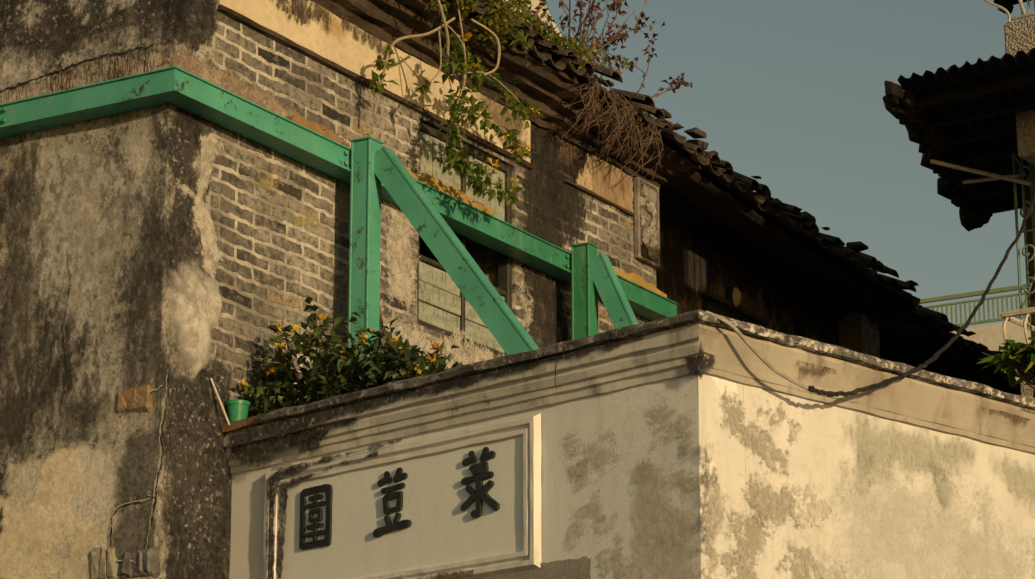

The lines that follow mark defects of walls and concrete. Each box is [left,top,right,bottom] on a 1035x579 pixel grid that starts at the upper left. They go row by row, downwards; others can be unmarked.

crack [0,40,170,92]
leakage [0,0,218,98]
leakage [0,93,641,579]
leakage [776,310,839,376]
spalling [477,427,632,579]
peeling [635,391,832,579]
peeling [777,543,846,579]